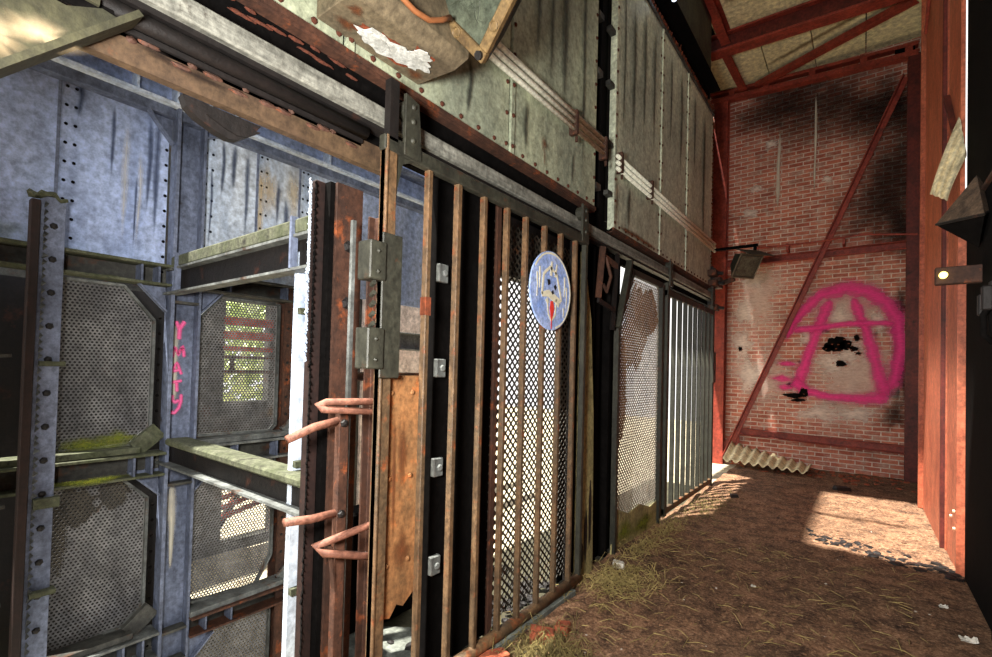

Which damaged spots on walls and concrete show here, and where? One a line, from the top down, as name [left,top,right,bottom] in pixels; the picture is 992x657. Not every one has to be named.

peeling [352,23,435,73]
leakage [134,131,159,227]
leakage [209,148,249,230]